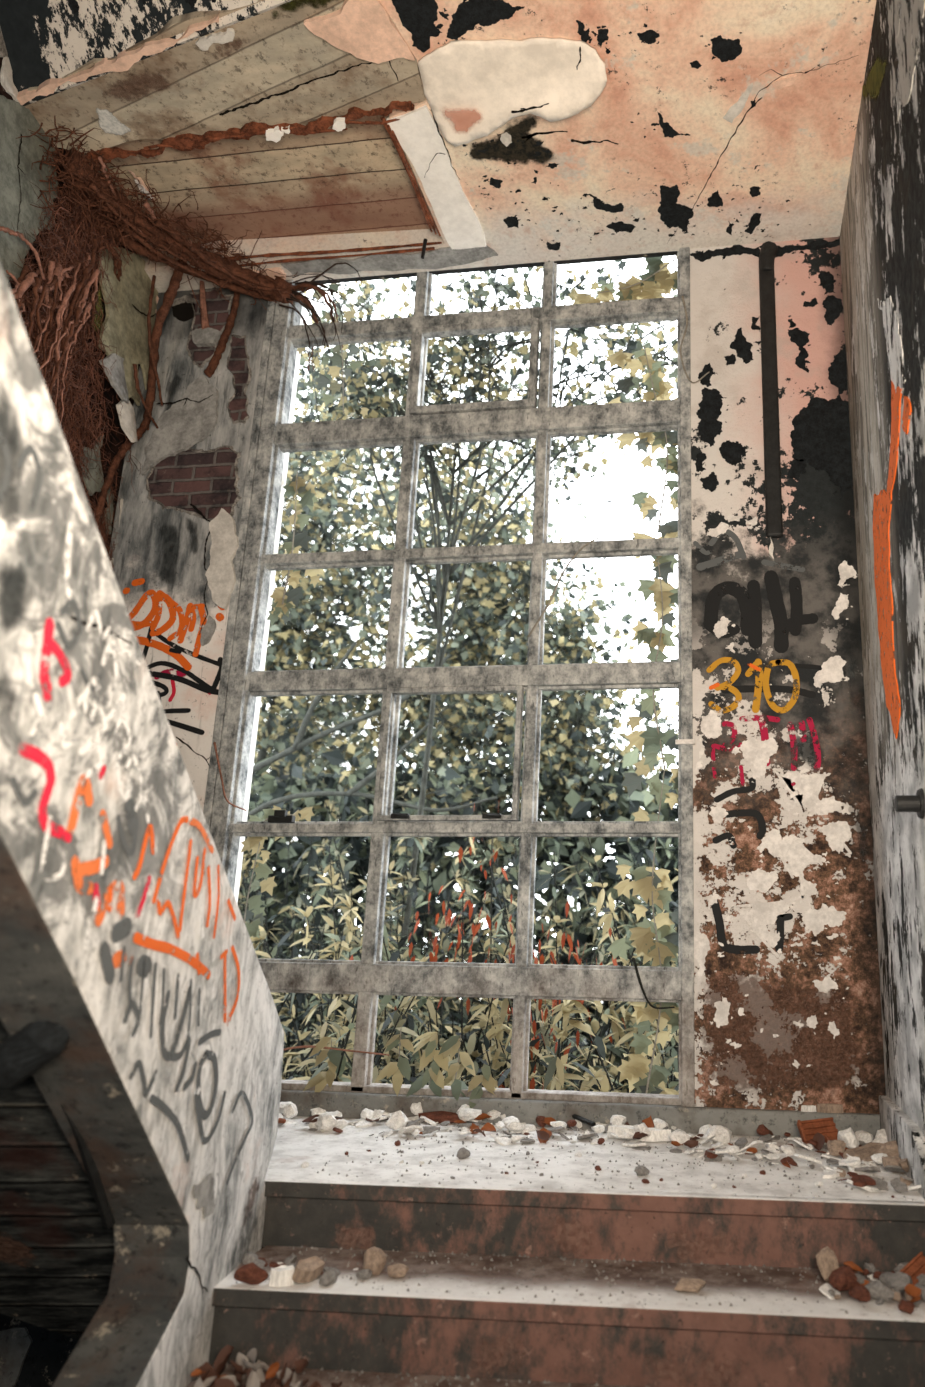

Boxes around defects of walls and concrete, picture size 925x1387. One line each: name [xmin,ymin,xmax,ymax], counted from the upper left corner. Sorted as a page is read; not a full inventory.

spalling [0,0,524,153]
flaking render [576,20,660,54]
flaking render [475,175,840,262]
flaking render [690,32,742,69]
crack [668,55,858,242]
spalling [97,247,252,646]
peeling [695,316,761,492]
peeling [788,319,811,373]
peeling [787,350,853,501]
peeling [832,560,858,620]
peeling [813,655,849,707]
peeling [693,710,852,1086]